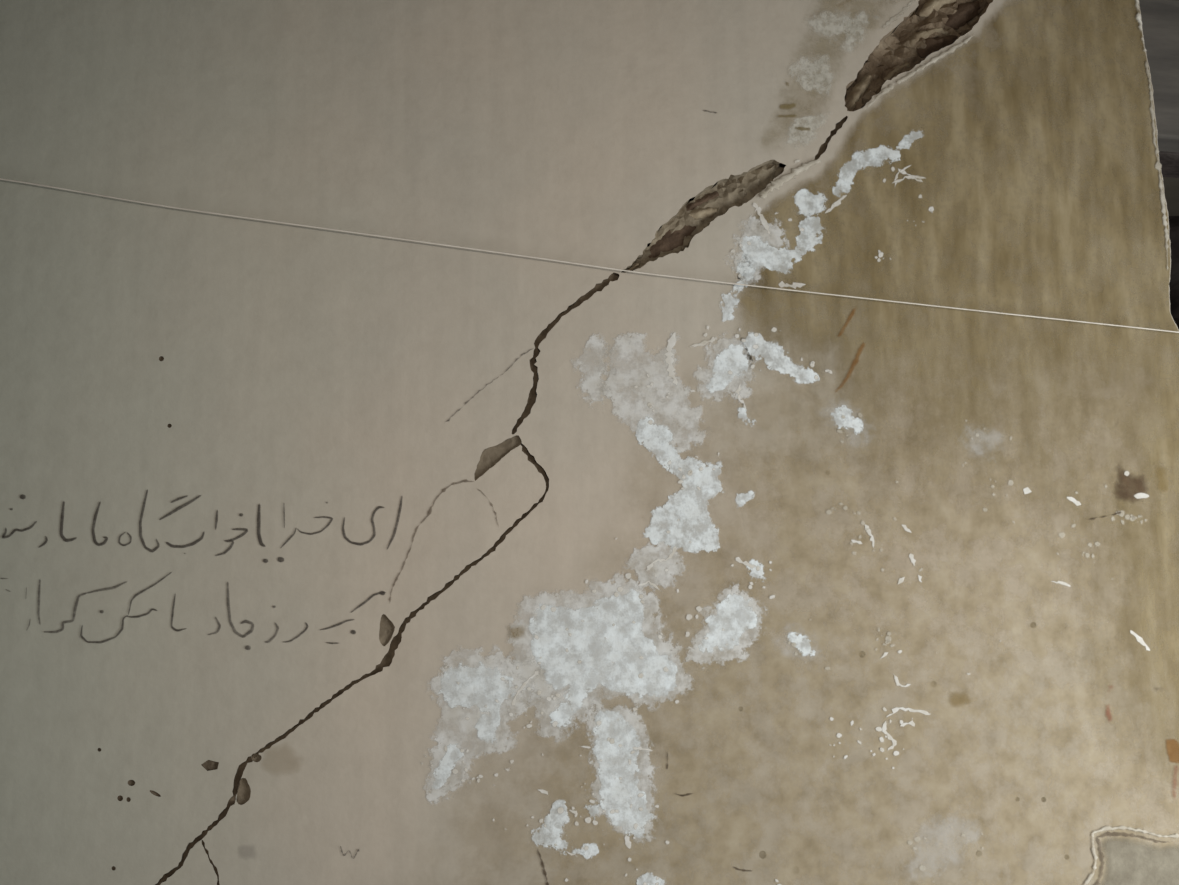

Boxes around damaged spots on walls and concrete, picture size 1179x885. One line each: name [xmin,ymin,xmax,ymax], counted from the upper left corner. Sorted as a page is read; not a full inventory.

crack [815,116,848,160]
spalling [786,0,993,144]
spalling [1136,0,1169,269]
spalling [621,160,785,273]
damp [422,0,1179,885]
crack [155,272,620,885]
peeling [1084,826,1179,885]